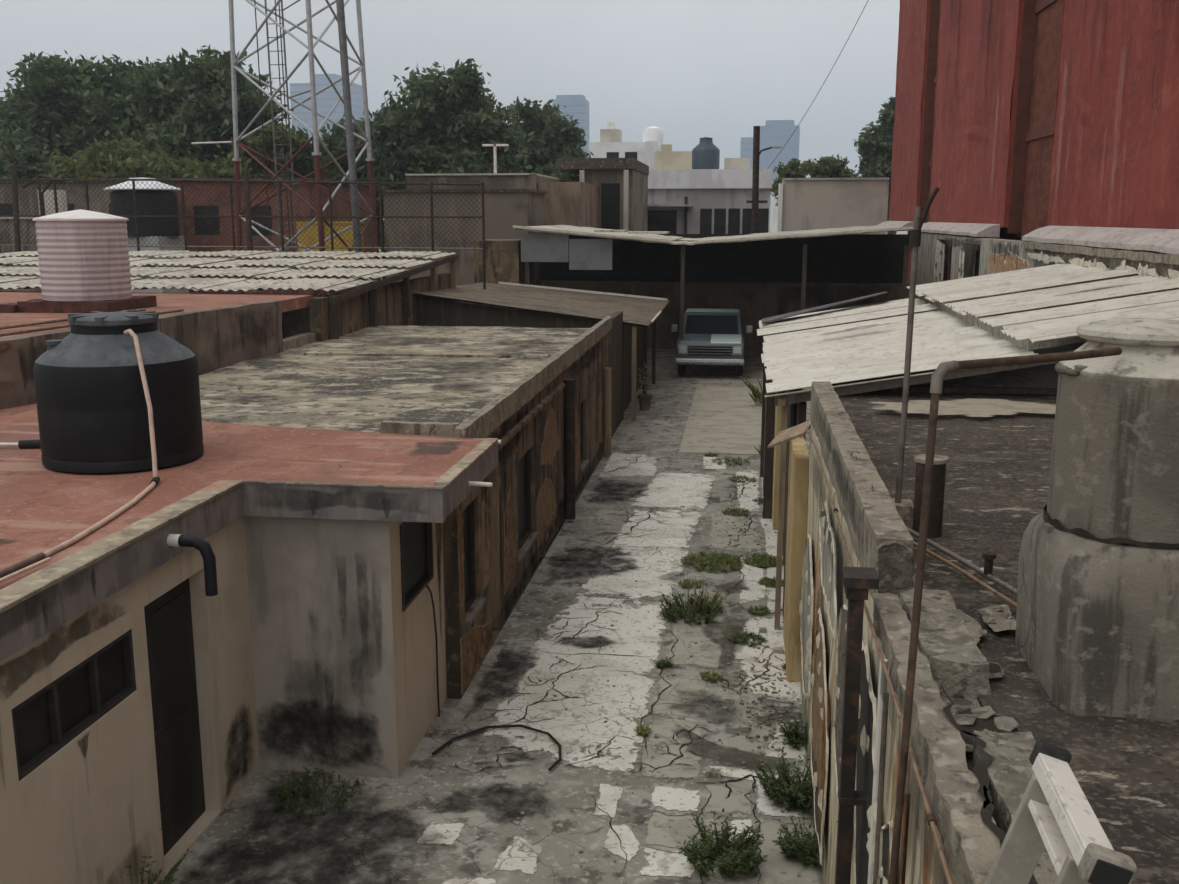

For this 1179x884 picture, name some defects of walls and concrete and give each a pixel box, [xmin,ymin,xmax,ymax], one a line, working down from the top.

crack [575,507,689,554]
crack [710,478,760,606]
rust [812,542,820,672]
spalling [876,540,916,595]
water stain [0,613,115,694]
spalling [988,661,1005,679]
water stain [78,733,89,755]
water stain [227,702,373,794]
crack [448,595,838,884]
crack [941,679,1007,842]
rust [887,743,910,884]
rust [923,826,938,884]